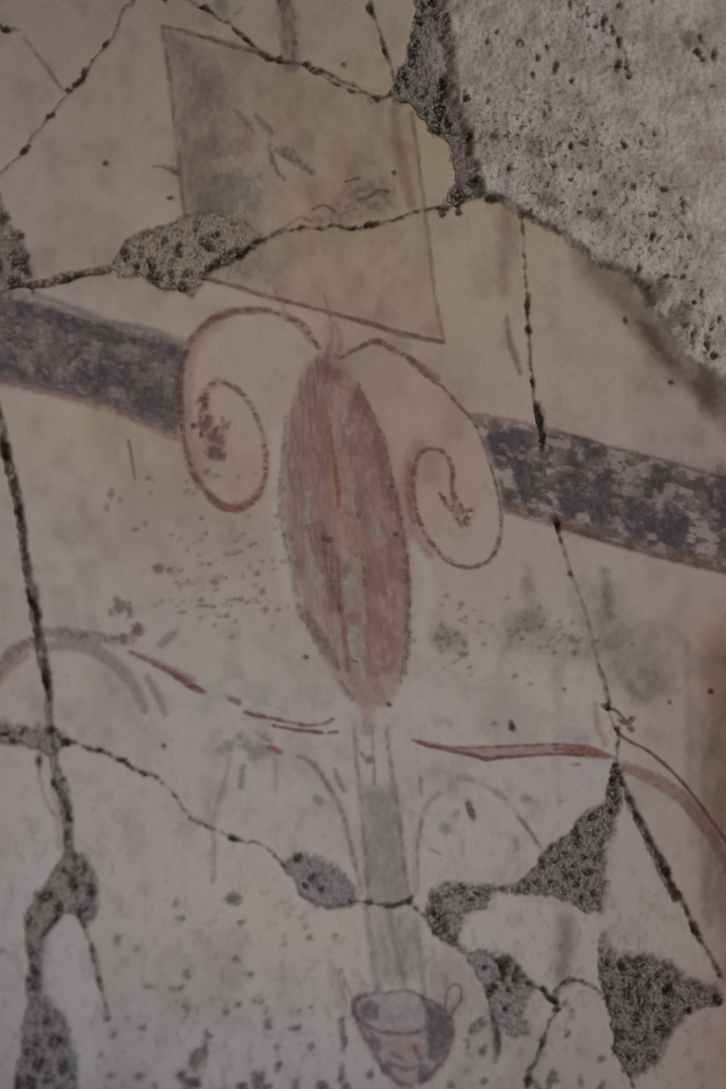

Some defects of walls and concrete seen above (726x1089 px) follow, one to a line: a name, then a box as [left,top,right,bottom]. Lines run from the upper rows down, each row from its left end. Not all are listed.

crack [199,4,394,102]
flaking render [389,0,562,233]
crack [2,267,111,293]
flaking render [108,209,261,292]
crack [521,223,546,493]
crack [0,413,284,872]
flaking render [15,853,97,1089]
flaking render [283,854,357,909]
flaking render [425,763,622,1057]
crack [524,979,596,1089]
flaking render [598,934,720,1077]
crack [596,653,723,1006]